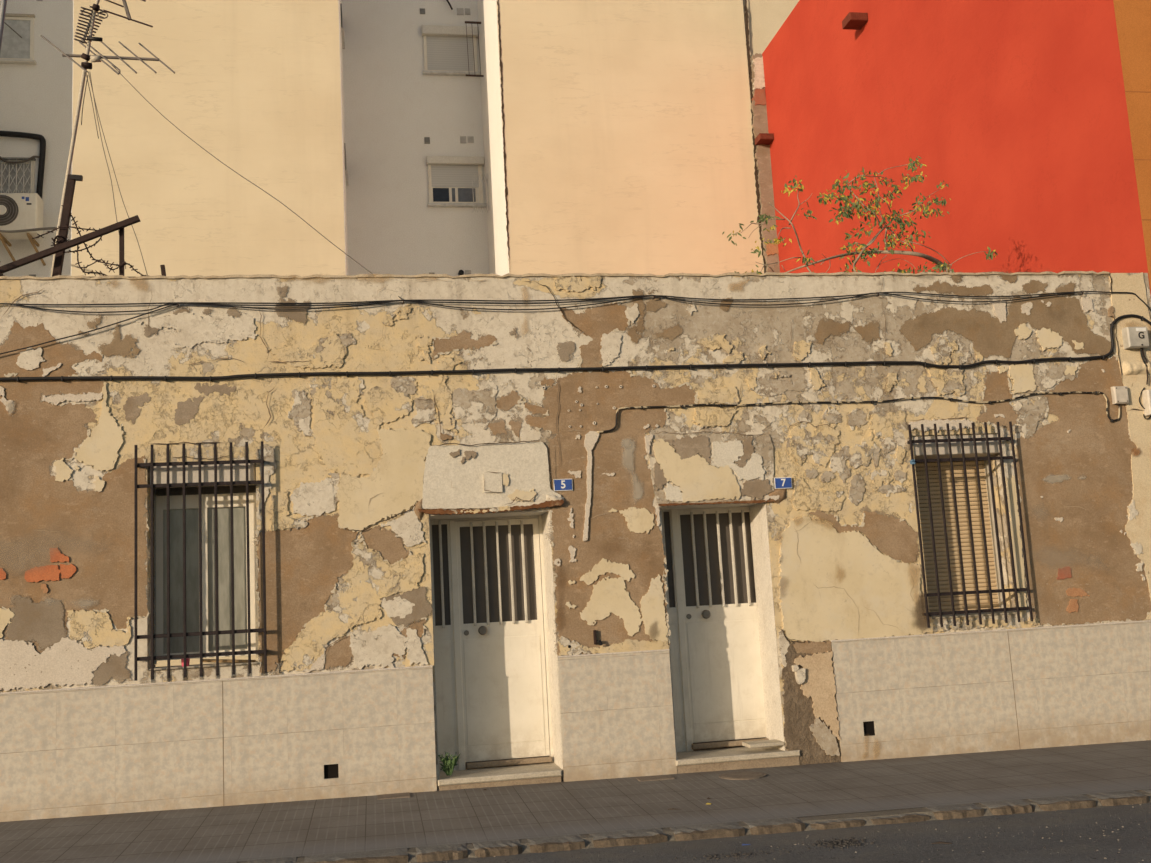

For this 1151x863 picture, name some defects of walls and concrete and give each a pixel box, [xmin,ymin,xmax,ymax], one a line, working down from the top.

flaking render [0,284,893,691]
flaking render [777,271,1151,765]